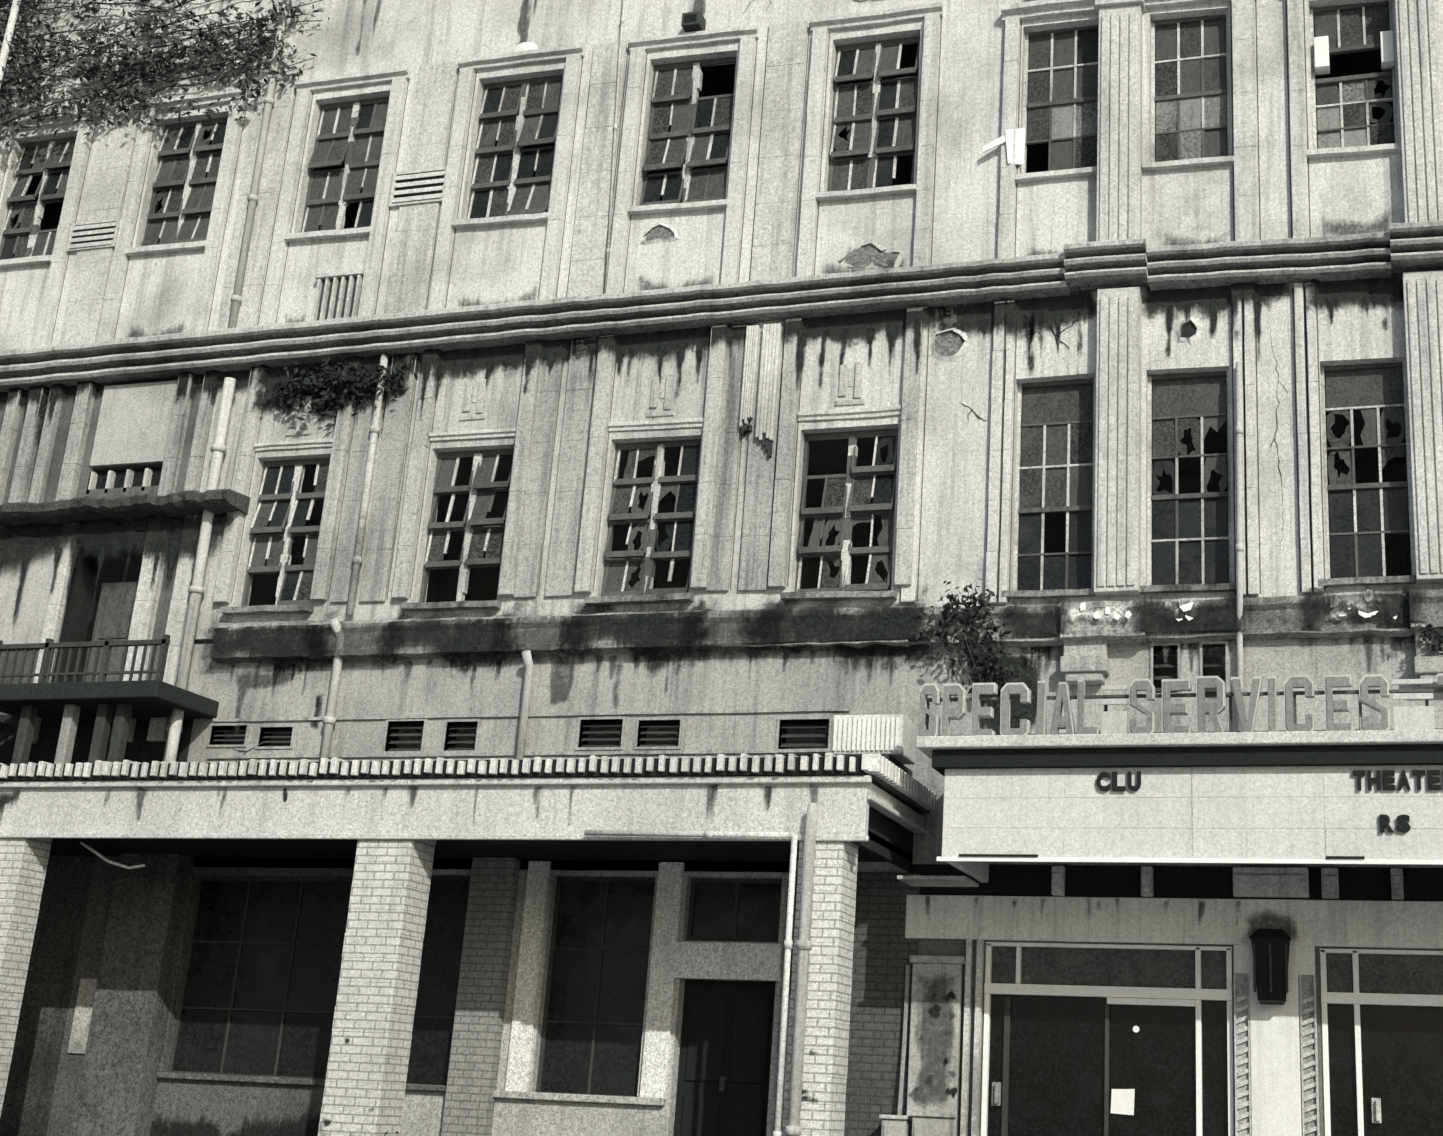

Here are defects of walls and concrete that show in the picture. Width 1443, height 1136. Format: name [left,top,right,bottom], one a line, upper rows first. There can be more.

water stain [518,0,537,43]
water stain [693,0,705,15]
flaking render [640,222,680,245]
flaking render [838,239,904,271]
water stain [1142,273,1404,356]
water stain [781,289,1097,386]
flaking render [930,327,970,362]
water stain [1299,583,1432,671]
water stain [202,593,933,723]
water stain [311,695,322,728]